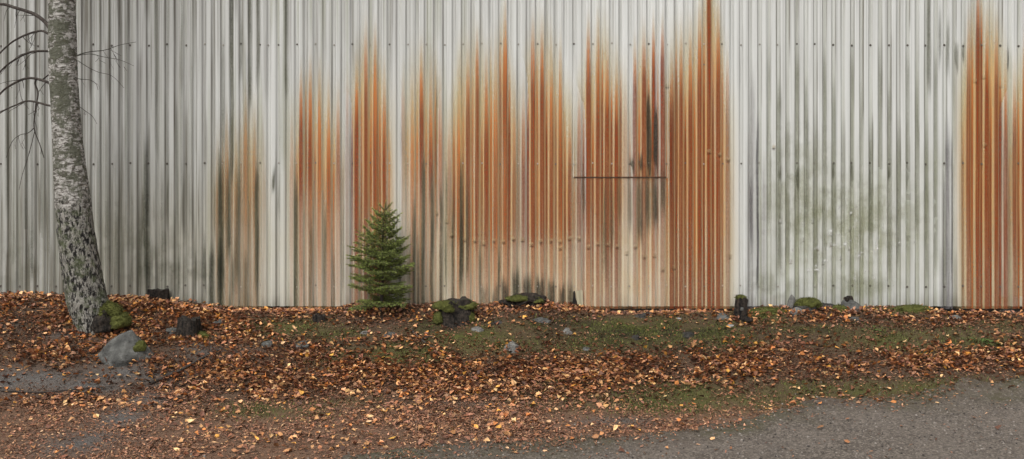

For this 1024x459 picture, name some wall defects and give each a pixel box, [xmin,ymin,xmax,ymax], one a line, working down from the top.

rust [297,89,340,255]
rust [352,60,390,304]
rust [406,0,728,309]
leakage [630,113,657,170]
leakage [638,182,664,231]
rust [963,7,1024,309]